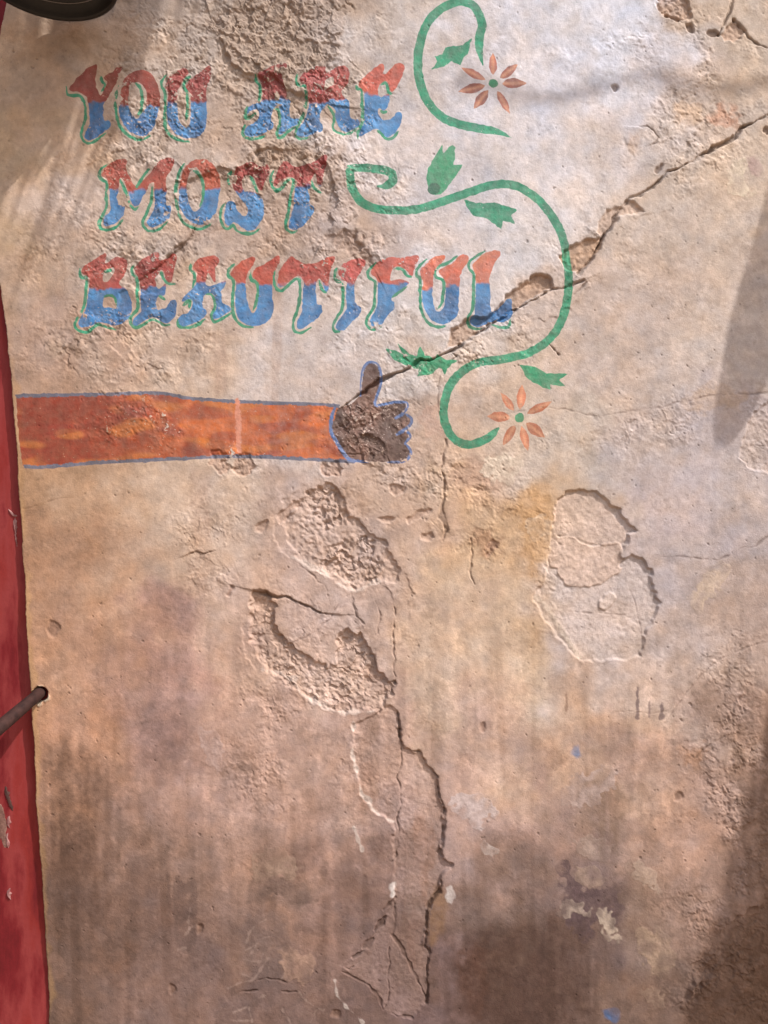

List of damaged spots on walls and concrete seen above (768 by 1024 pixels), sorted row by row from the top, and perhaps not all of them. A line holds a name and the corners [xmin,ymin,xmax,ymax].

crack [716,0,768,50]
crack [339,112,768,586]
crack [251,587,340,644]
crack [390,603,398,685]
flaking render [531,487,663,665]
water stain [121,687,194,793]
flaking render [244,463,504,1024]
water stain [34,719,126,947]
water stain [154,862,208,961]
water stain [229,877,319,993]
crack [395,710,452,1006]
water stain [434,781,635,1024]